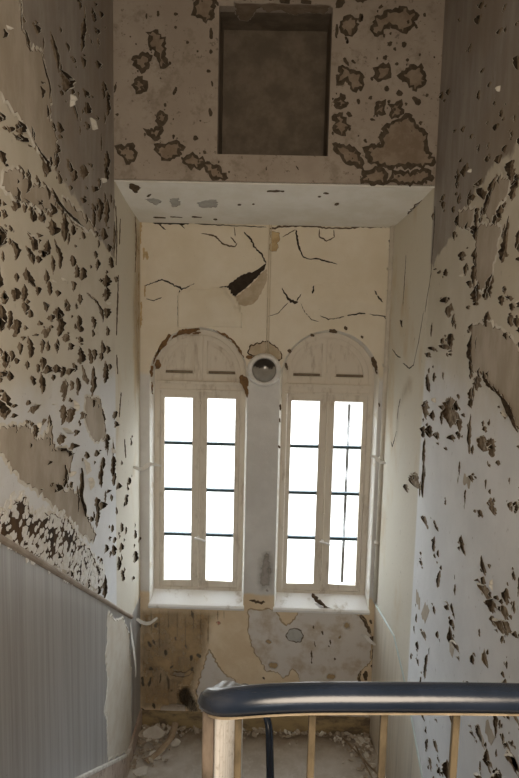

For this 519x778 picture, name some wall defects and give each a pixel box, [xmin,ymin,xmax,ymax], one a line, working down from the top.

peeling [130,29,171,94]
peeling [233,0,436,187]
peeling [143,103,230,181]
crack [154,223,390,264]
crack [145,279,194,323]
flaking render [150,264,292,394]
peeling [420,515,442,588]
leakage [140,611,220,712]
peeling [247,608,374,682]
peeling [410,575,489,682]
peeling [474,555,519,644]
peeling [468,716,519,778]